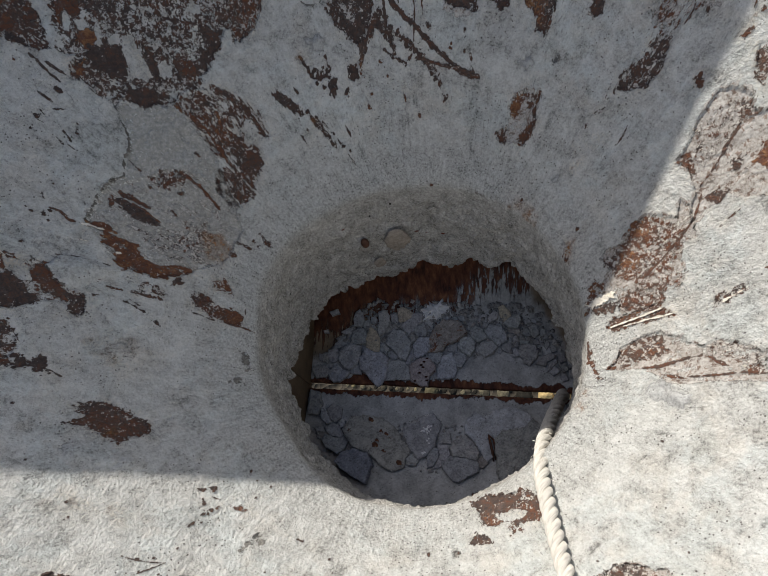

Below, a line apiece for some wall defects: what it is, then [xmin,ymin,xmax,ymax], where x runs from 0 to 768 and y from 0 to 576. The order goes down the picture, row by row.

corrosion [298,0,381,99]
corrosion [594,0,722,115]
corrosion [0,0,273,313]
corrosion [586,44,768,387]
corrosion [0,251,99,377]
corrosion [191,278,255,333]
spalling [359,348,390,387]
spalling [437,336,476,380]
corrosion [61,401,151,445]
spalling [307,389,541,481]
corrosion [469,487,542,546]
corrosion [593,560,671,576]